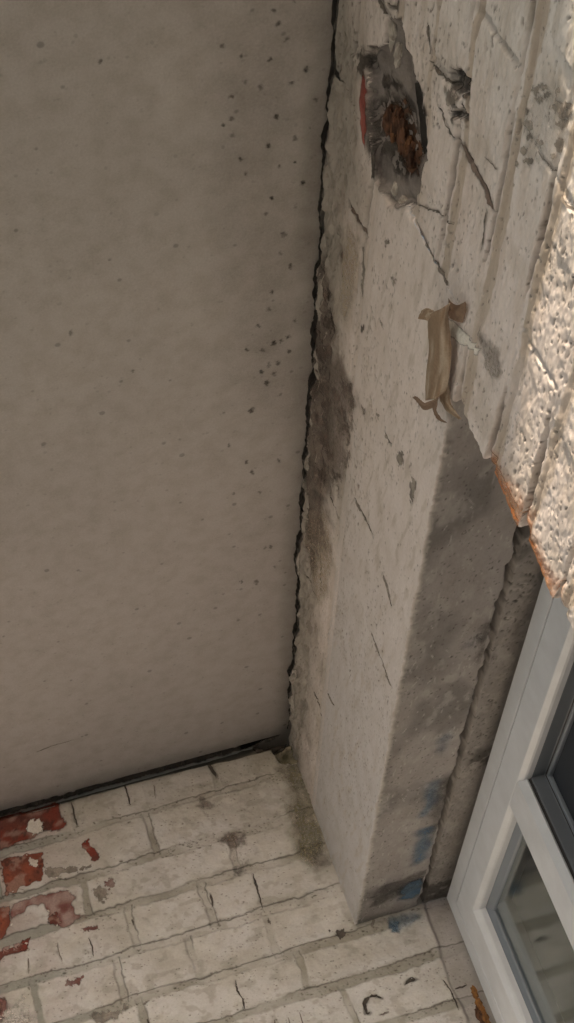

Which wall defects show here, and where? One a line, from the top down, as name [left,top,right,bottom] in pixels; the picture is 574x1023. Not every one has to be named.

spalling [357,17,428,209]
spalling [444,68,472,124]
leakage [306,263,354,563]
peeling [0,802,100,961]
peeling [92,1004,128,1023]